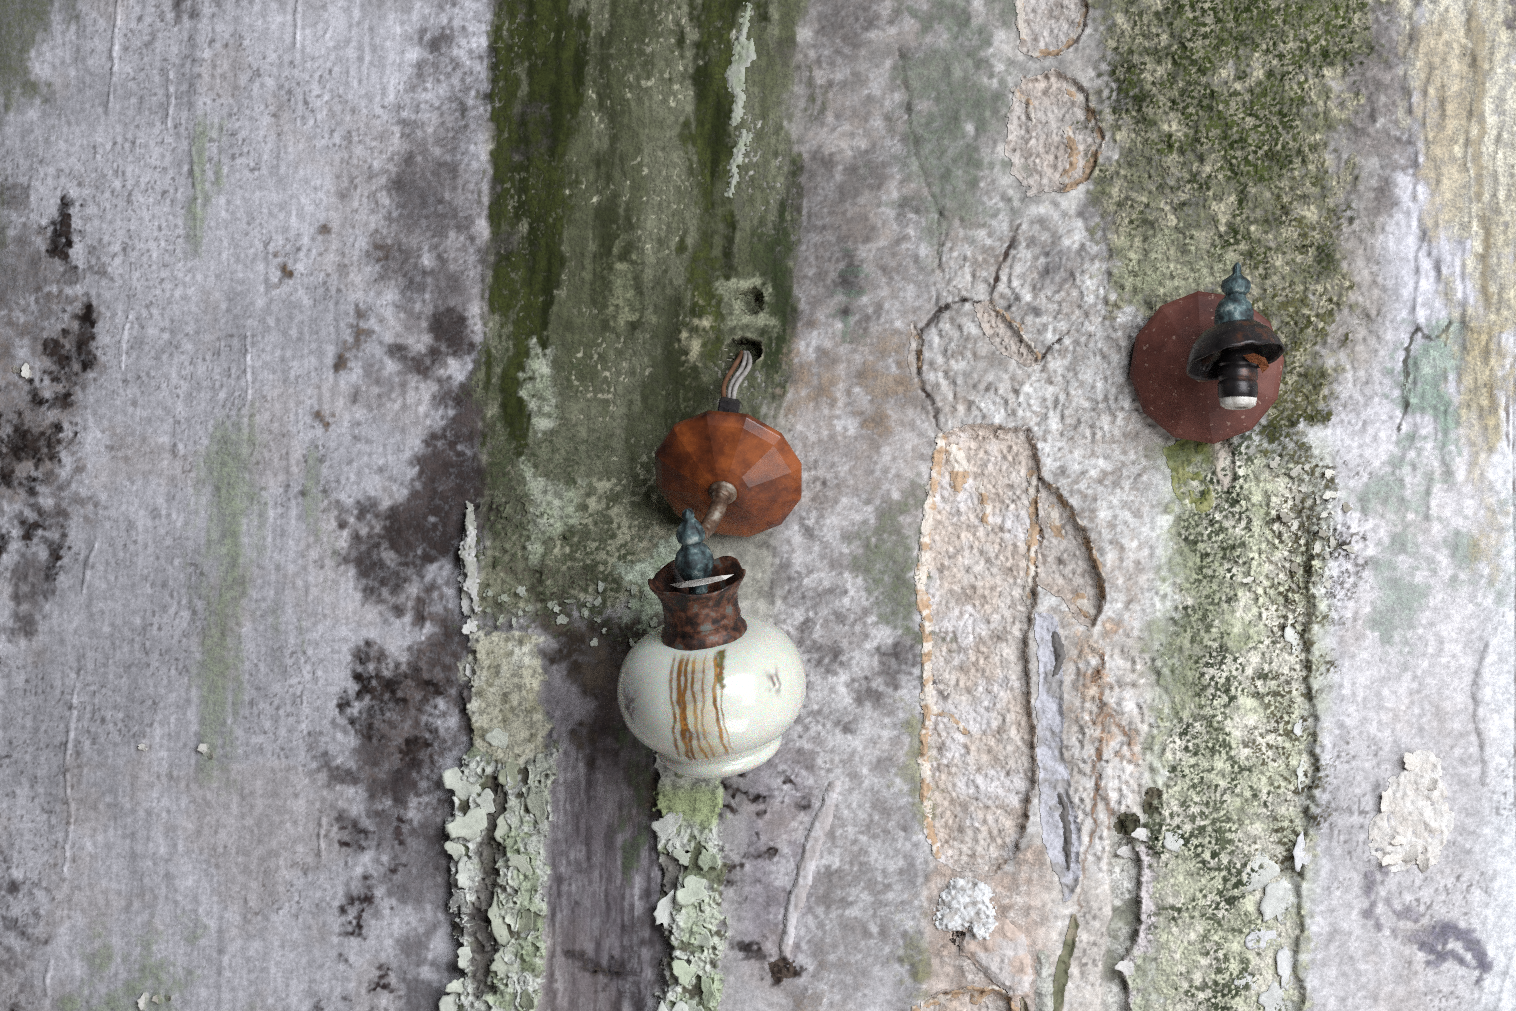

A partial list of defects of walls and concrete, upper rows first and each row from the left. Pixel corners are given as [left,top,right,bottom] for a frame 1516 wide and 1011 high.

water stain [0,195,101,637]
crack [920,380,938,426]
crack [915,223,1022,340]
crack [1040,332,1069,362]
peeling [457,501,607,647]
water stain [324,0,865,1011]
peeling [438,707,563,1011]
peeling [651,751,730,1011]
peeling [1368,750,1455,873]